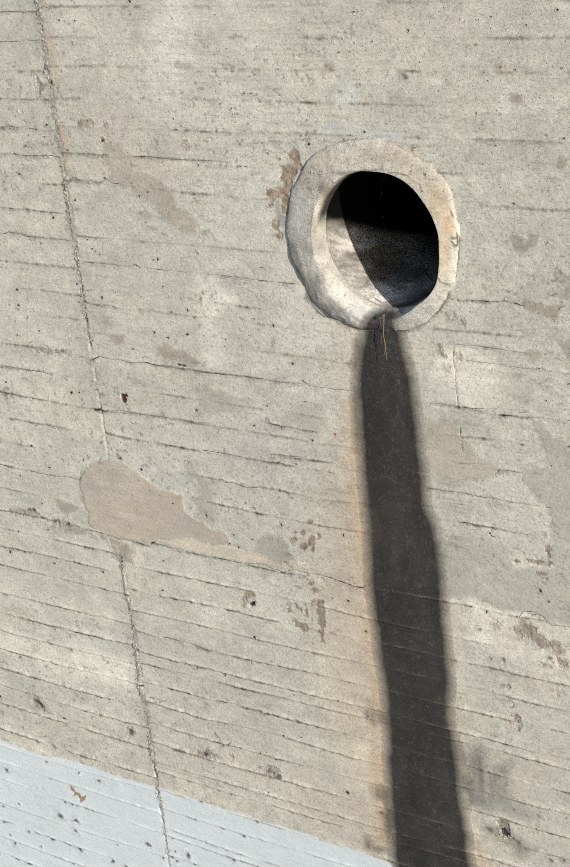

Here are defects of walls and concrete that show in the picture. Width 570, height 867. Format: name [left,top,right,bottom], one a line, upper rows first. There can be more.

crack [0,0,360,393]
crack [401,231,524,334]
crack [0,393,48,401]
crack [89,408,216,426]
crack [265,417,317,436]
crack [169,445,242,460]
crack [269,453,305,461]
crack [0,464,82,480]
crack [218,479,263,491]
water stain [292,276,570,867]
crack [21,615,95,636]
crack [1,649,57,665]